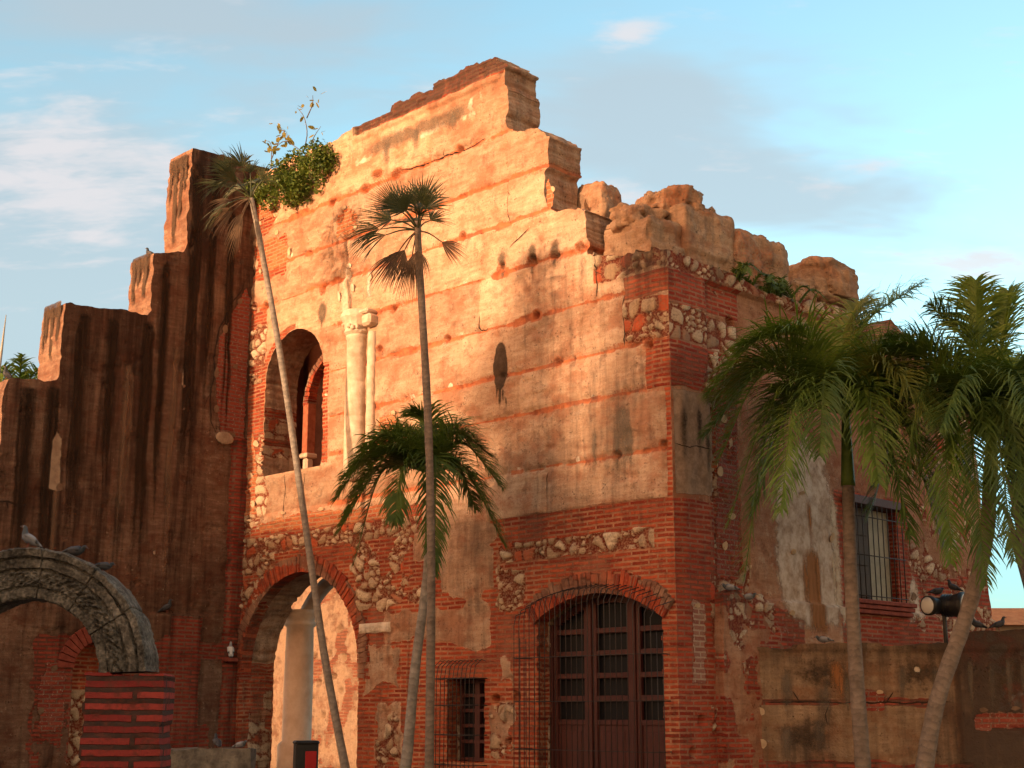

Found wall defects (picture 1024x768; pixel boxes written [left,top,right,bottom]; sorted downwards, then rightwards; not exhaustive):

damp [42,301,61,358]
damp [103,319,118,450]
damp [131,253,150,305]
damp [134,263,170,541]
damp [169,155,236,427]
damp [493,343,508,404]
damp [681,409,710,466]
flaking render [776,437,842,628]
damp [782,662,850,750]